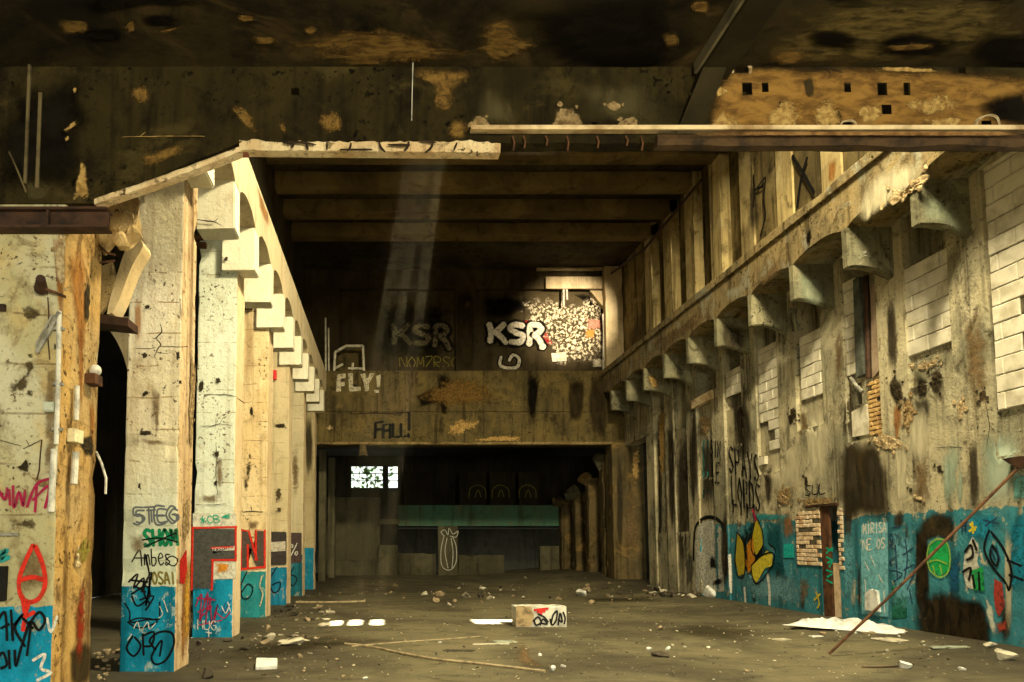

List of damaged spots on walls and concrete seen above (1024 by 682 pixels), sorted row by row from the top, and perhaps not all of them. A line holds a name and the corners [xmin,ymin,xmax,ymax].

peeling [300,27,467,109]
peeling [480,21,530,59]
peeling [712,0,1024,125]
spalling [94,108,501,207]
spalling [880,164,928,210]
corrosion [55,258,84,388]
crack [136,324,188,357]
leakage [528,379,539,415]
flaking render [867,370,918,455]
flaking render [774,474,845,570]
leakage [842,390,989,641]